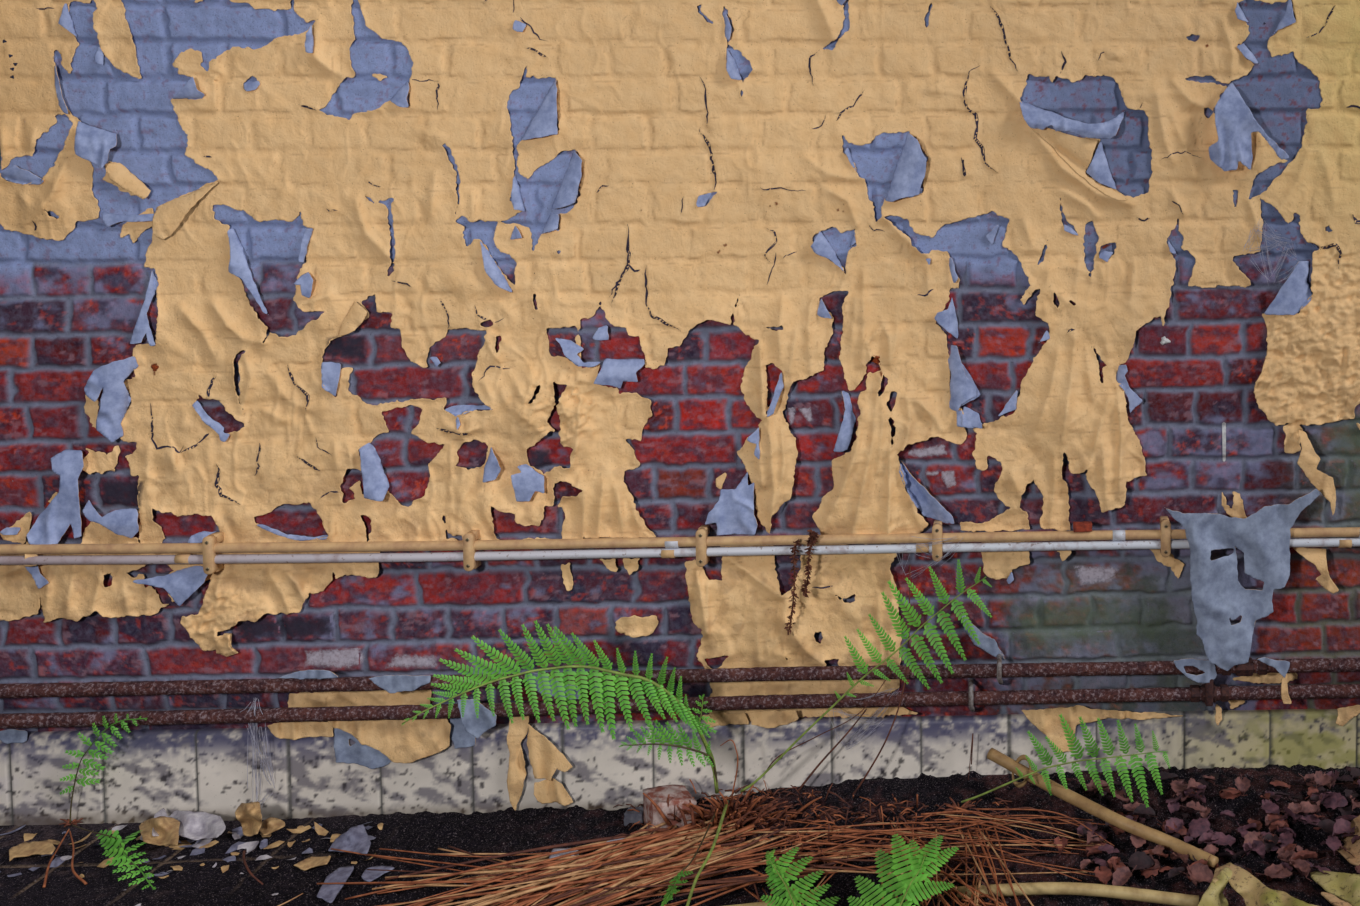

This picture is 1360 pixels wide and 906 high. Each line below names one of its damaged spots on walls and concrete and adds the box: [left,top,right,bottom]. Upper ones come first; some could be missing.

crack [961,8,1017,176]
crack [609,224,678,329]
peeling [0,0,1360,722]